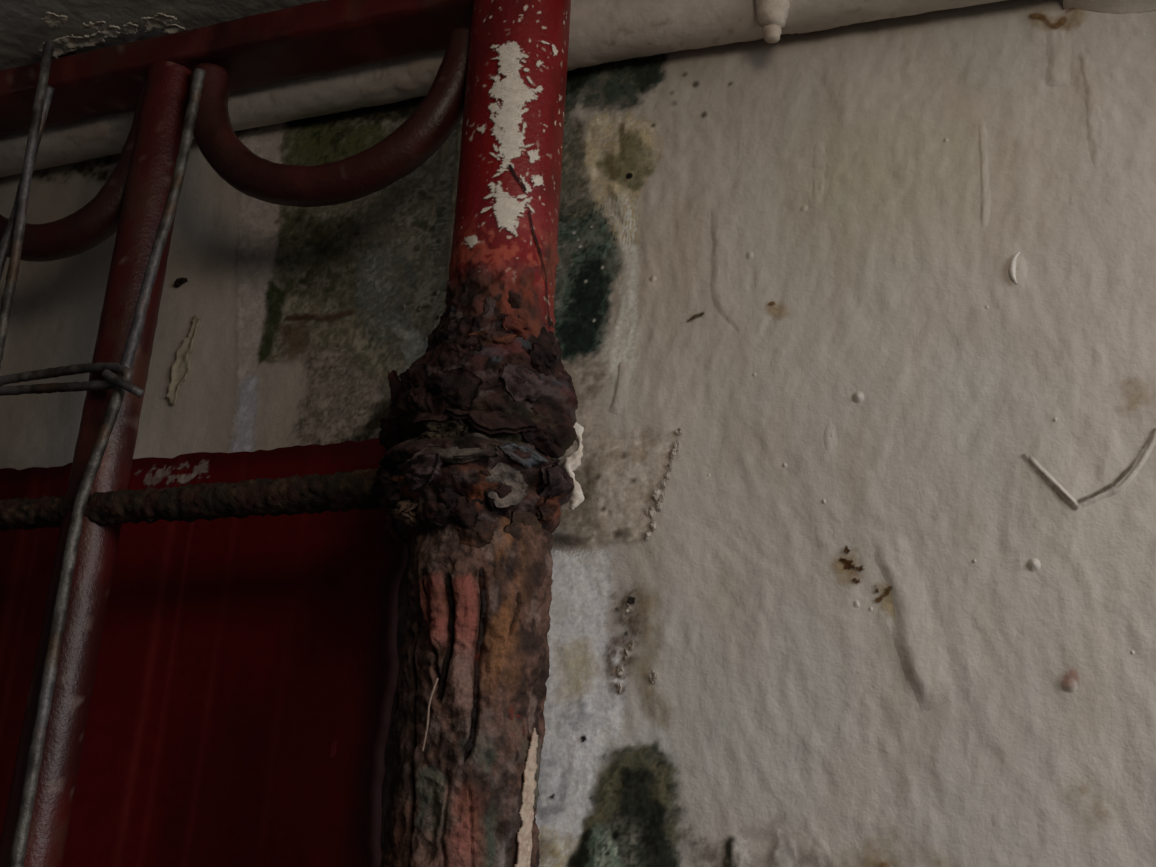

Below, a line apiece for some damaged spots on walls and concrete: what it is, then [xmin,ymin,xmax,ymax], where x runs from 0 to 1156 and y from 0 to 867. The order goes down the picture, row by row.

water stain [281,96,425,166]
water stain [259,117,463,445]
peeling [477,41,558,237]
water stain [554,53,666,380]
water stain [232,377,257,452]
corrosion [379,313,595,548]
corrosion [835,545,863,583]
corrosion [874,585,896,617]
water stain [535,546,736,867]